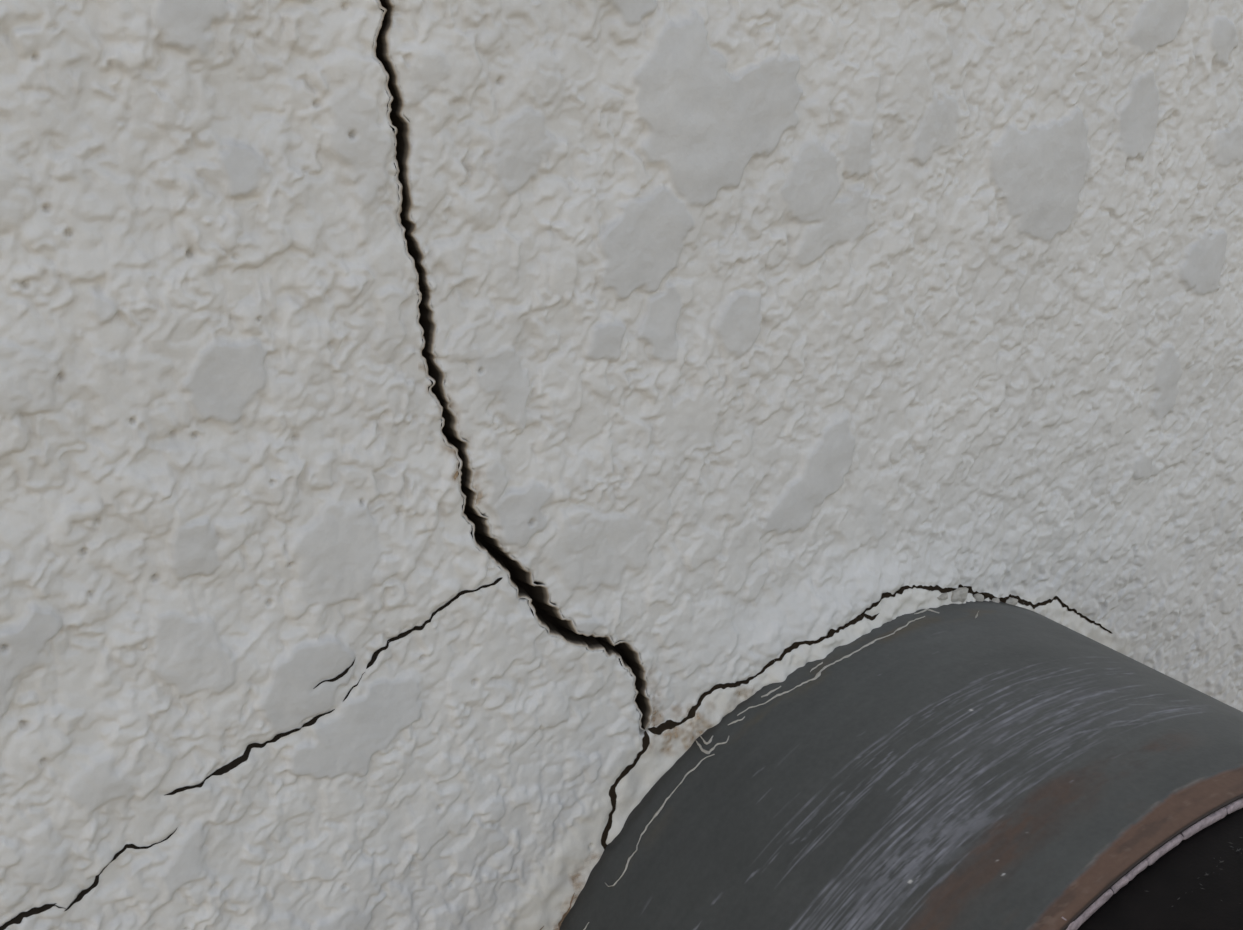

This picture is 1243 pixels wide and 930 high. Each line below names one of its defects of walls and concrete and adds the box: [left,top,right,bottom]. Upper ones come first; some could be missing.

crack [166,0,1113,850]
crack [0,827,178,930]
crack [540,893,575,930]